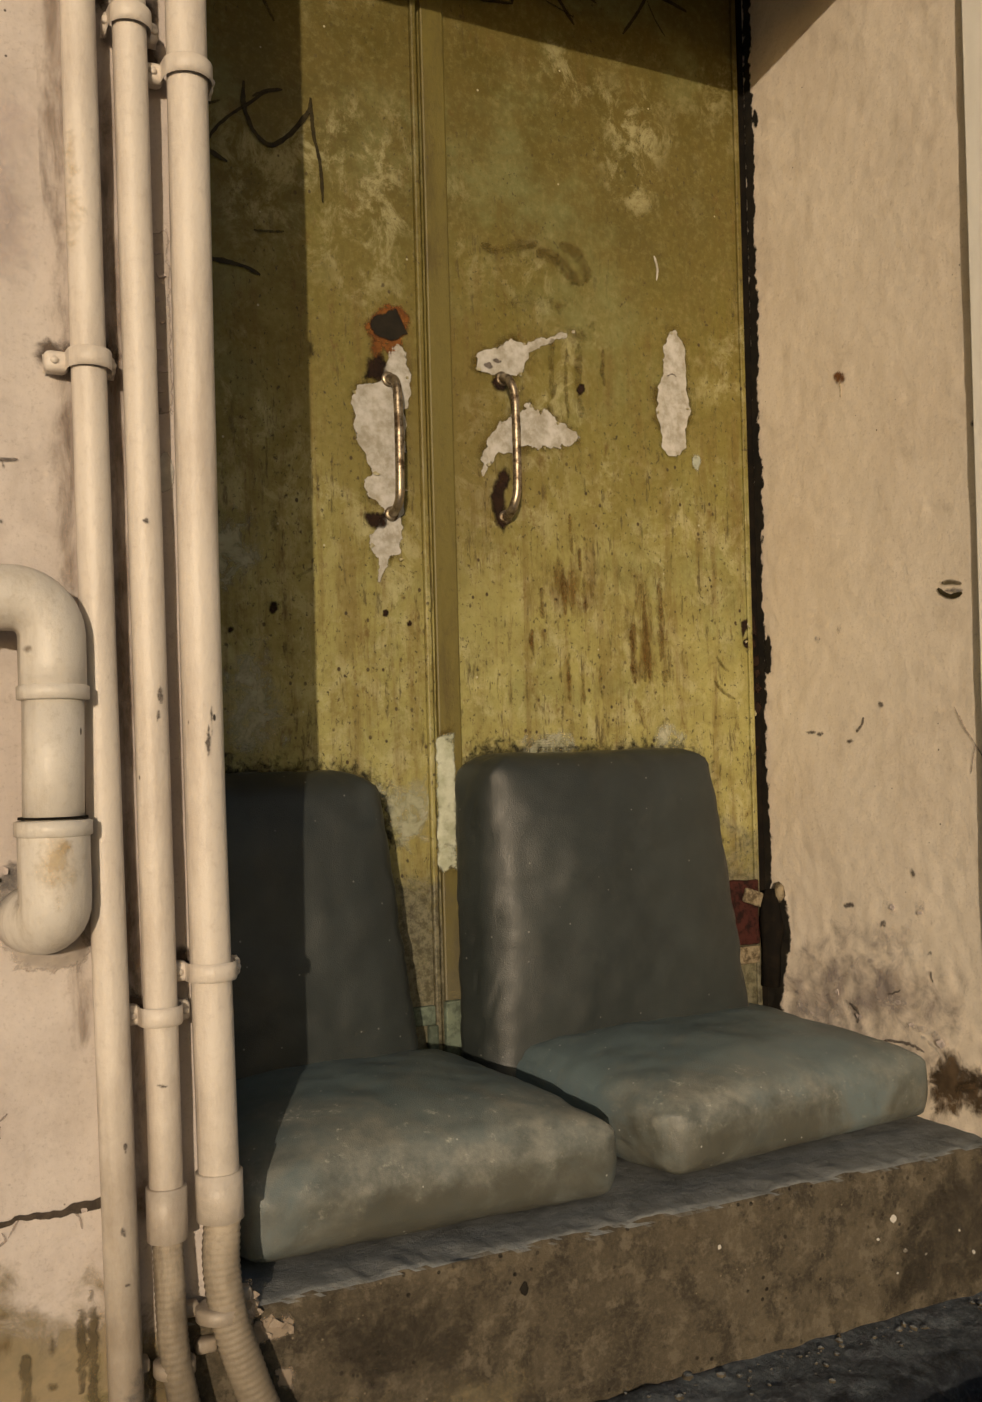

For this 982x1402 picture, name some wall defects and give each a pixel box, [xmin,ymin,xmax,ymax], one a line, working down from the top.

peeling [351,344,411,582]
corrosion [364,304,410,381]
peeling [473,330,575,377]
peeling [480,403,579,476]
peeling [654,330,700,470]
leakage [742,0,772,889]
corrosion [630,585,662,683]
spalling [0,864,17,903]
leakage [768,899,901,1023]
crack [0,1197,101,1247]
leakage [0,1283,108,1402]
leakage [142,1331,167,1402]